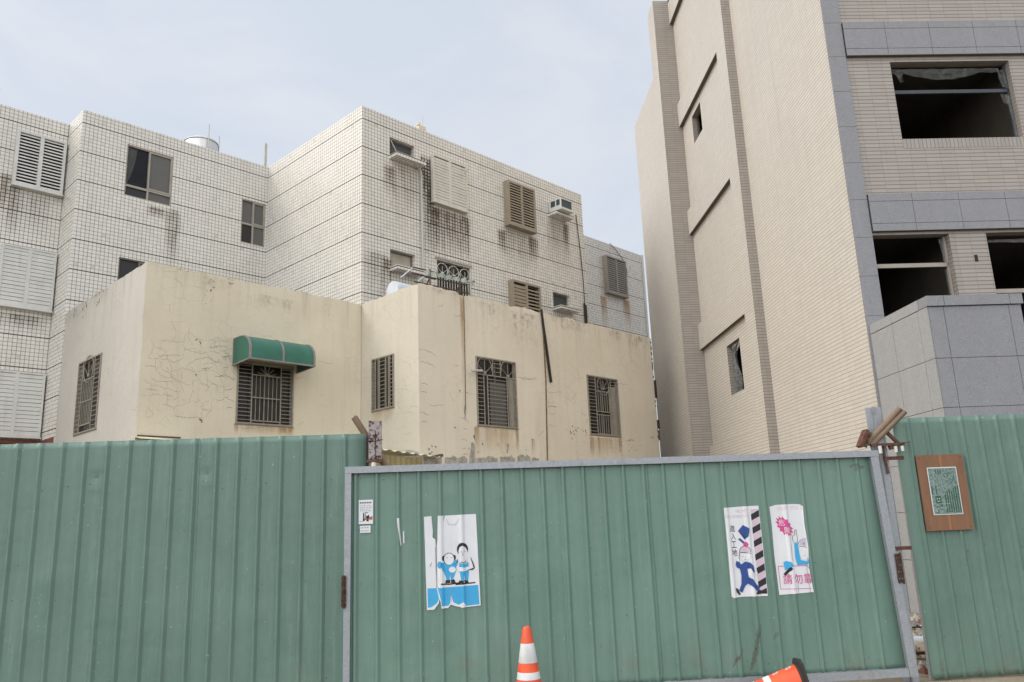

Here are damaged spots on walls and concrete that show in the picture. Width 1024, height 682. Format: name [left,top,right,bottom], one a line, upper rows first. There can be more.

leakage [149,206,179,252]
leakage [384,157,469,250]
crack [132,332,271,430]